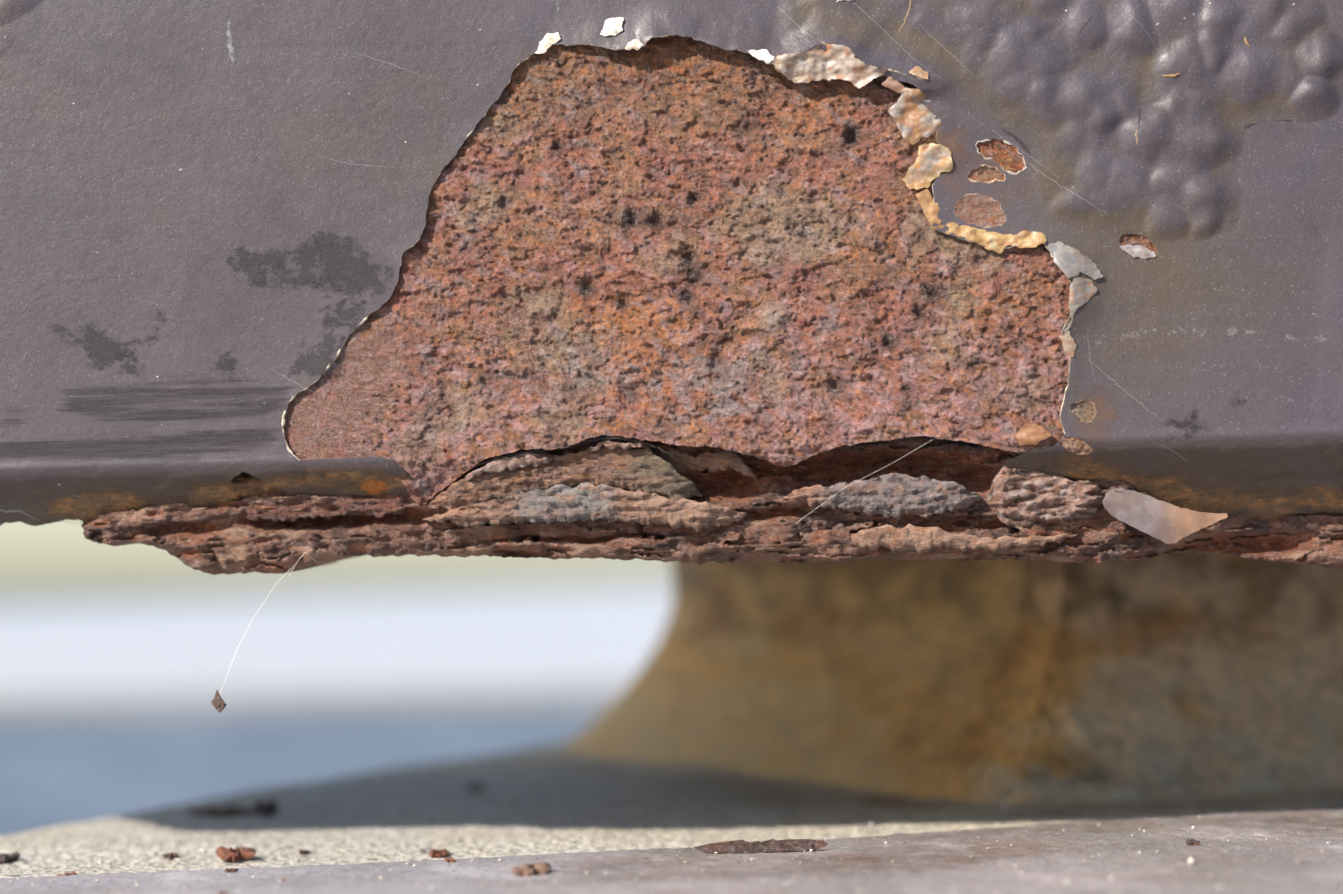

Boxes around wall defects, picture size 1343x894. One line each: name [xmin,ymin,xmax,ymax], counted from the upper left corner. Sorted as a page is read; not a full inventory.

spalling [953,139,1027,228]
rust [191,17,1343,555]
damp [0,232,393,458]
spalling [1058,400,1097,455]
rust [48,491,148,519]